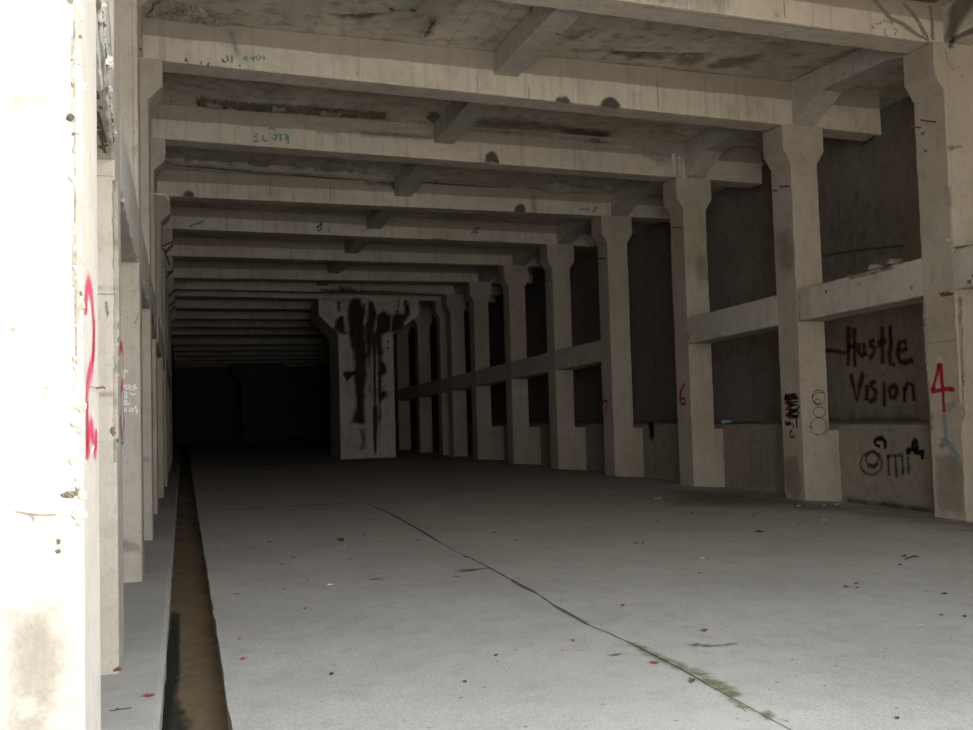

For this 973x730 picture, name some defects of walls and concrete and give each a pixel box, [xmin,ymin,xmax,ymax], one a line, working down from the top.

corrosion [333,298,409,454]
crack [194,459,791,730]